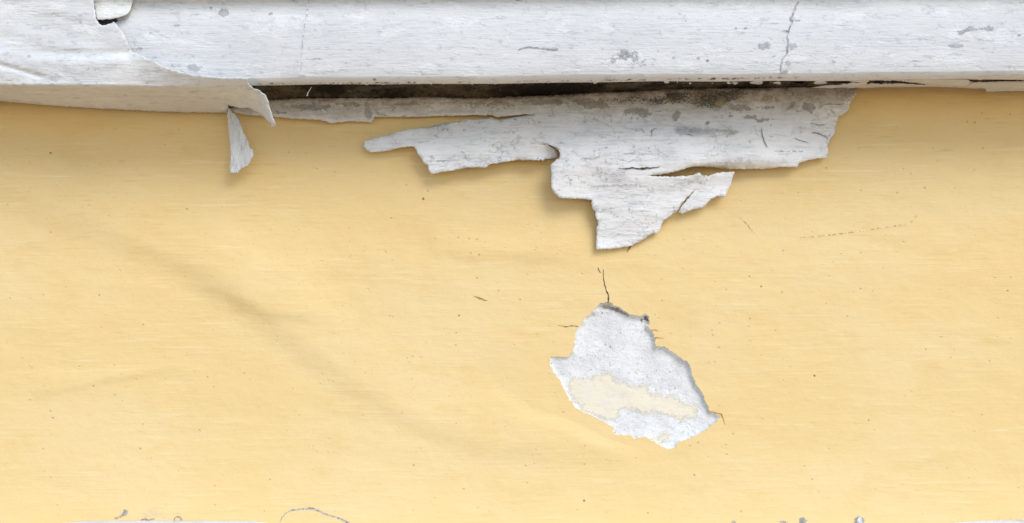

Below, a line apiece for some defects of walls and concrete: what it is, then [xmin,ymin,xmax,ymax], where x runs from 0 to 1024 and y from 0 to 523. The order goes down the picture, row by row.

crack [780,1,800,74]
peeling [0,0,1024,250]
spalling [550,302,720,449]